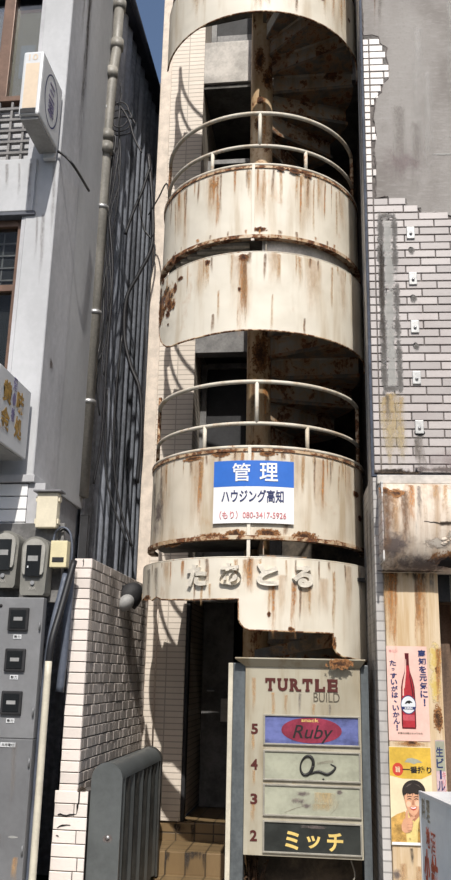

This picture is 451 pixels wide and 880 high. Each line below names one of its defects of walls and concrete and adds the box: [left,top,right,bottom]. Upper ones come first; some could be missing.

corrosion [254,47,271,137]
spalling [362,0,451,216]
corrosion [247,167,340,220]
corrosion [238,252,251,304]
corrosion [251,333,269,414]
corrosion [182,451,355,506]
damp [374,435,451,475]
corrosion [194,524,319,541]
corrosion [379,485,421,557]
corrosion [384,573,397,633]
corrosion [415,574,426,624]
crack [56,792,80,836]